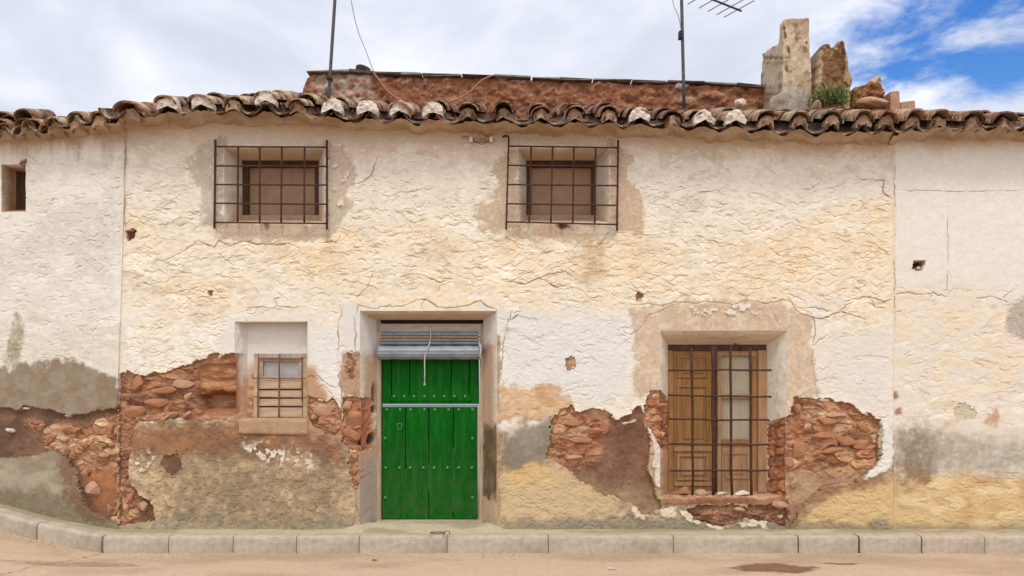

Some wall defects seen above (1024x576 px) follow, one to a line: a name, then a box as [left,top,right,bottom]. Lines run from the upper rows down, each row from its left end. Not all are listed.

crack [120,137,128,222]
crack [176,240,293,255]
crack [510,271,594,301]
leakage [0,313,121,416]
leakage [0,459,104,525]
spalling [0,354,236,525]
flaking render [242,440,313,470]
spalling [308,351,363,490]
peeling [546,292,896,530]
leakage [896,429,985,483]